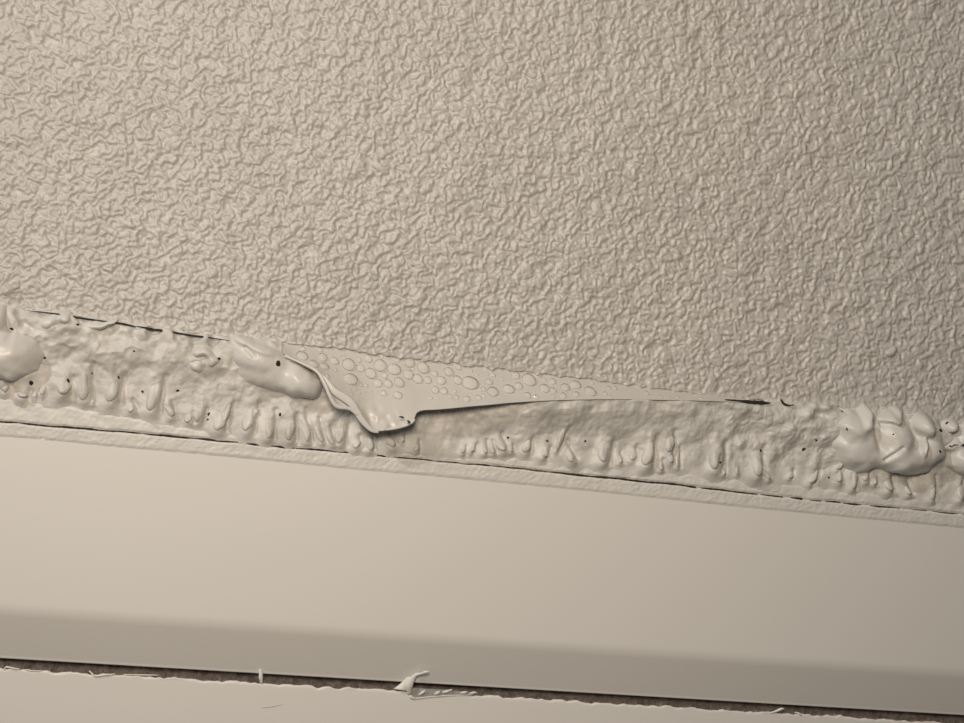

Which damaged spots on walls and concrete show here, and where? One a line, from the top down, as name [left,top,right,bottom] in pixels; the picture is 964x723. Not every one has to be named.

peeling [282,342,763,433]
peeling [394,671,477,699]